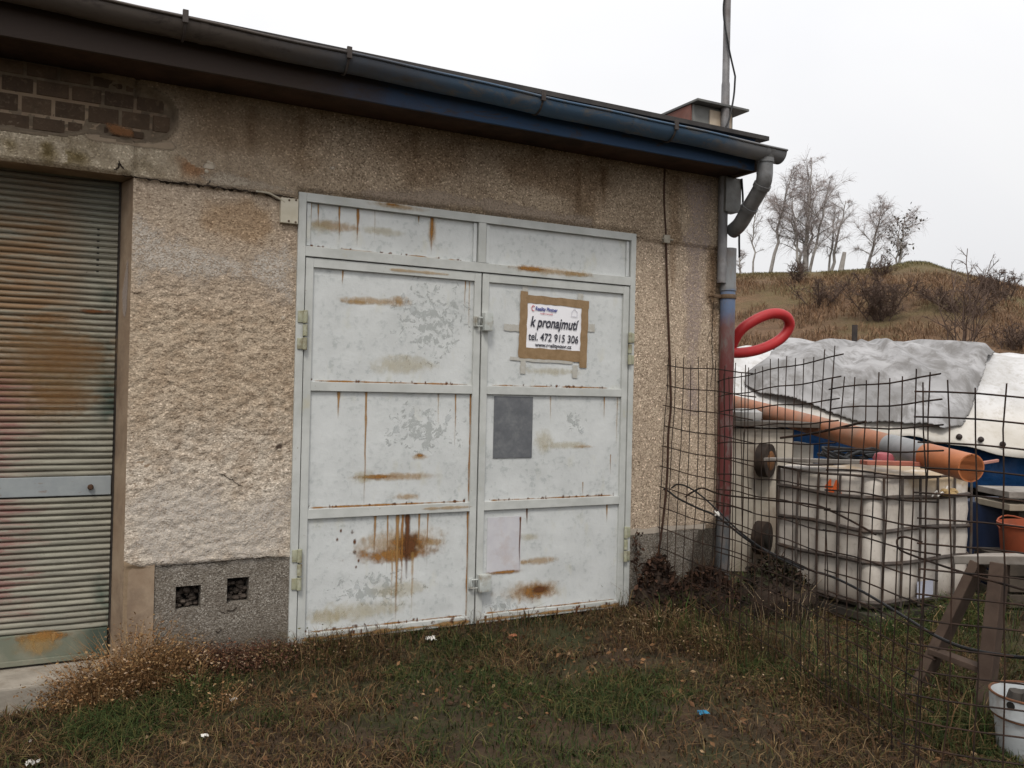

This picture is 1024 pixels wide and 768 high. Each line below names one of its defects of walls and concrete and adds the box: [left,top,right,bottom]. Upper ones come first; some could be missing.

spalling [0,57,179,150]
crack [114,161,295,201]
peeling [392,276,470,367]
peeling [386,403,461,453]
corrosion [303,380,619,643]